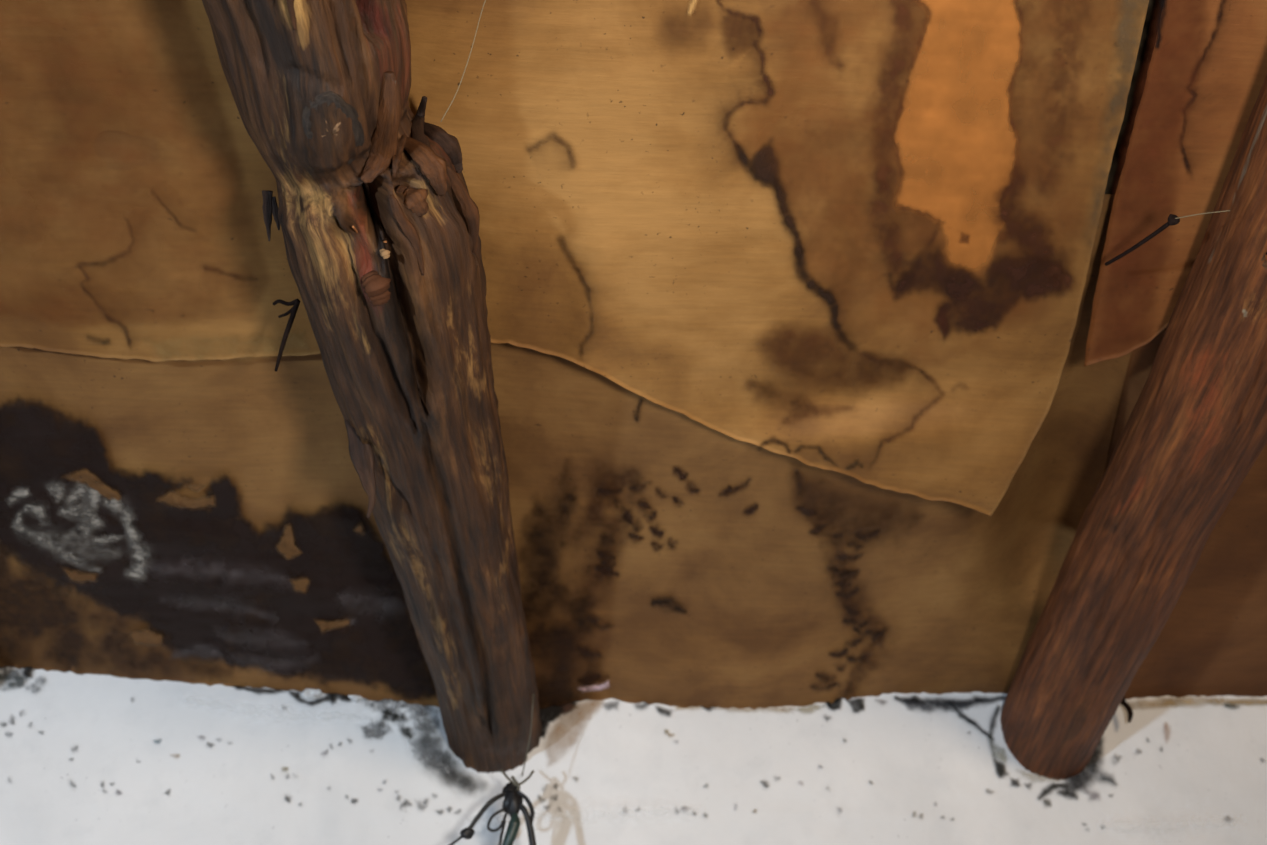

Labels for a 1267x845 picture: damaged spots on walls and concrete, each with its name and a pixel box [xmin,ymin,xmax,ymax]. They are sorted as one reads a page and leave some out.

leakage [717,0,903,384]
leakage [872,0,1072,335]
mould [0,667,45,690]
leakage [522,493,610,709]
leakage [580,467,699,582]
leakage [651,598,686,613]
leakage [795,471,892,697]